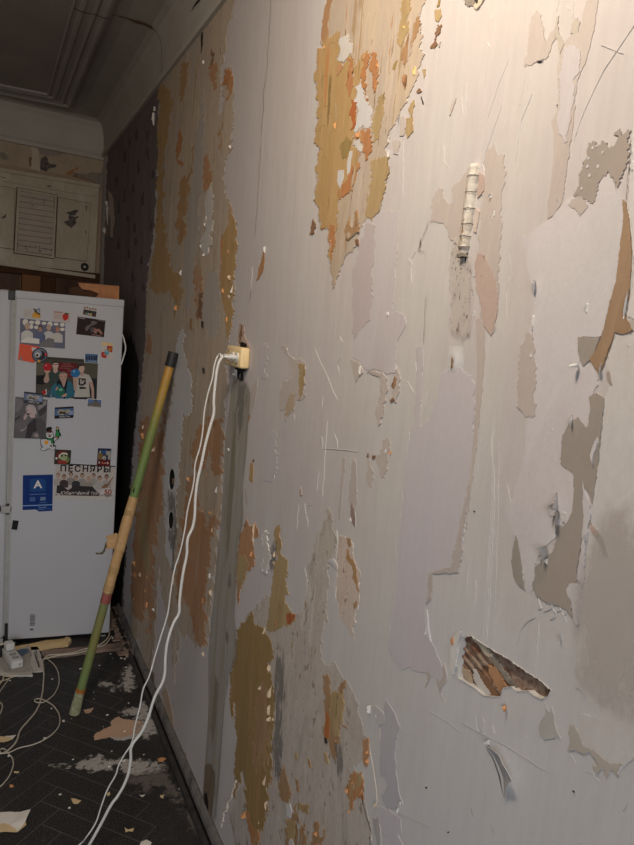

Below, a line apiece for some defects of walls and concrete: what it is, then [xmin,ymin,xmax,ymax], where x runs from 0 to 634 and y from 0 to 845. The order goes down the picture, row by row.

crack [73,8,162,71]
peeling [130,0,250,683]
damp [205,379,250,820]
peeling [228,438,403,845]
peeling [310,0,442,426]
flaking render [464,0,485,10]
flaking render [450,629,561,740]
peeling [511,393,605,624]